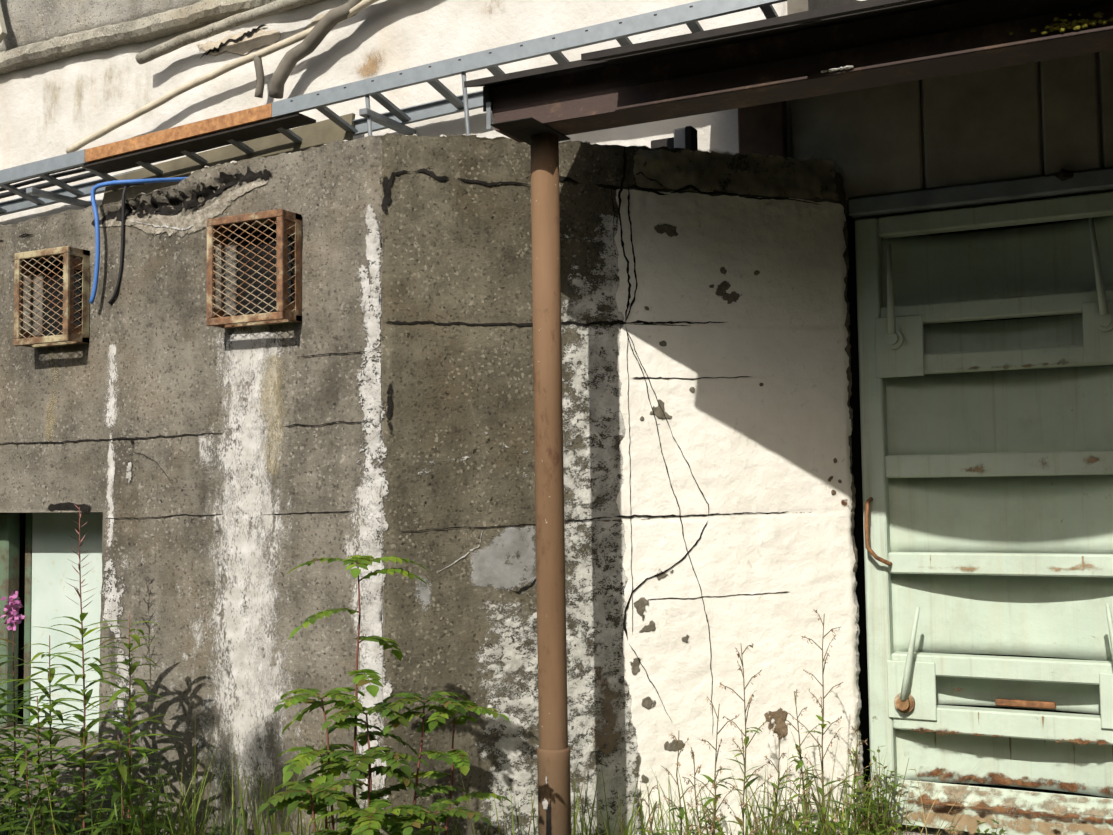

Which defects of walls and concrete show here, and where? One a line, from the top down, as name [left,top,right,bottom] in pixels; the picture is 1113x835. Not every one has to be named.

spalling [91,166,271,237]
water stain [193,325,292,808]
water stain [345,203,393,805]
crack [384,166,529,191]
crack [385,320,533,328]
crack [401,524,536,532]
peeling [471,527,549,835]
crack [559,147,820,733]
peeling [561,146,864,835]